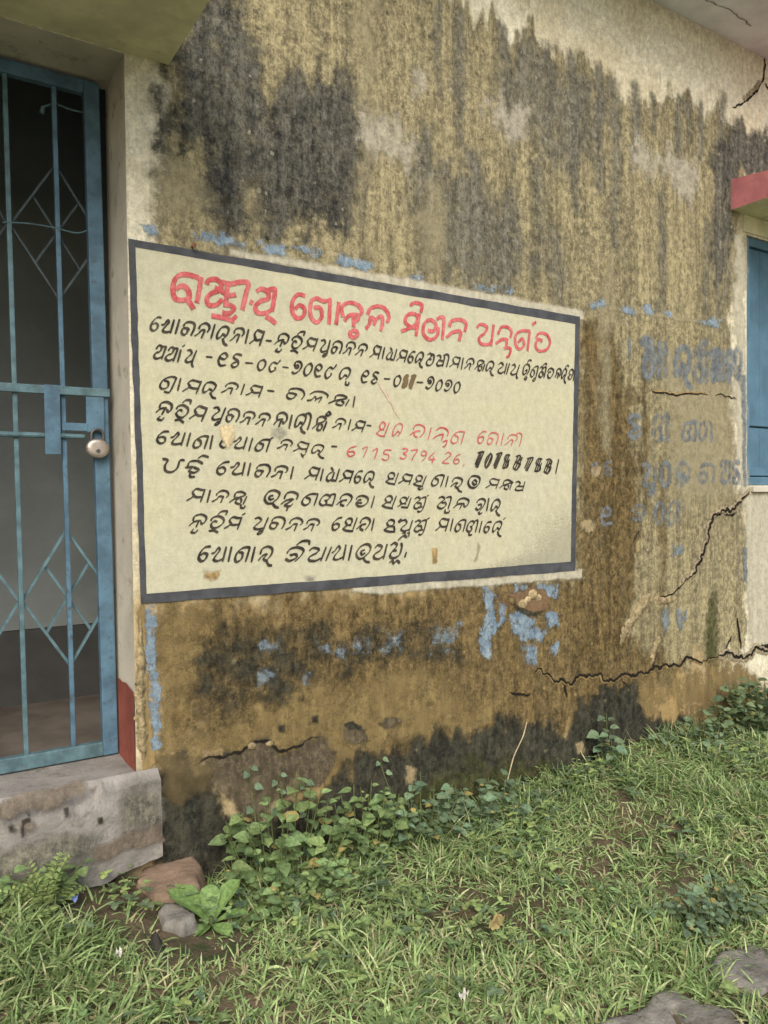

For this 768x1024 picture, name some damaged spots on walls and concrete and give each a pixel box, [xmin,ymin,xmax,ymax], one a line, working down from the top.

crack [732,59,768,108]
crack [653,390,737,400]
water stain [122,0,768,879]
crack [660,488,750,598]
peeling [478,583,560,665]
crack [510,617,768,697]
flaking render [344,722,368,745]